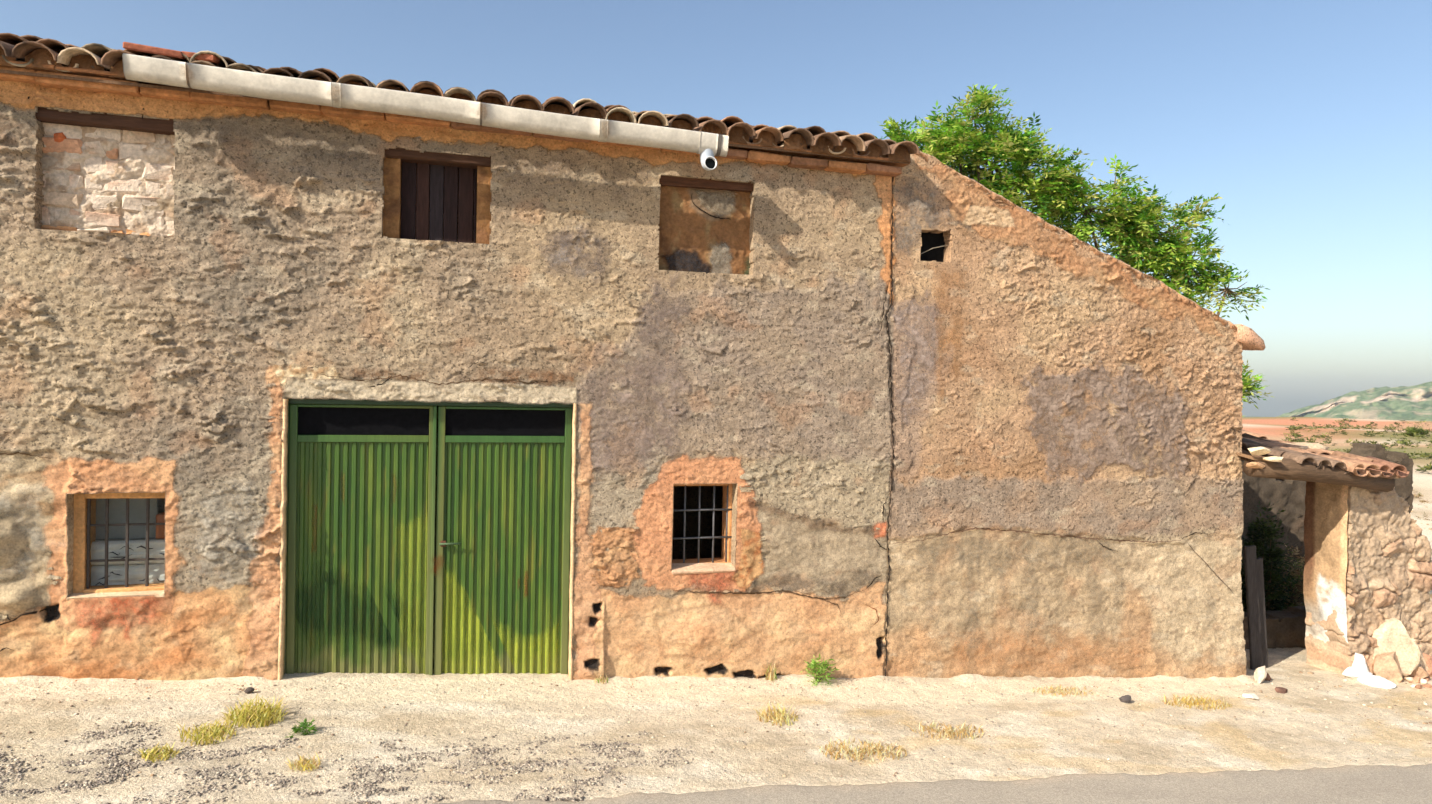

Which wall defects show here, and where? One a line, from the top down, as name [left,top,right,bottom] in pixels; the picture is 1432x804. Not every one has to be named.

flaking render [0,80,788,166]
flaking render [696,190,735,216]
flaking render [710,243,732,274]
flaking render [0,359,339,681]
flaking render [572,404,887,680]
crack [674,177,1231,676]